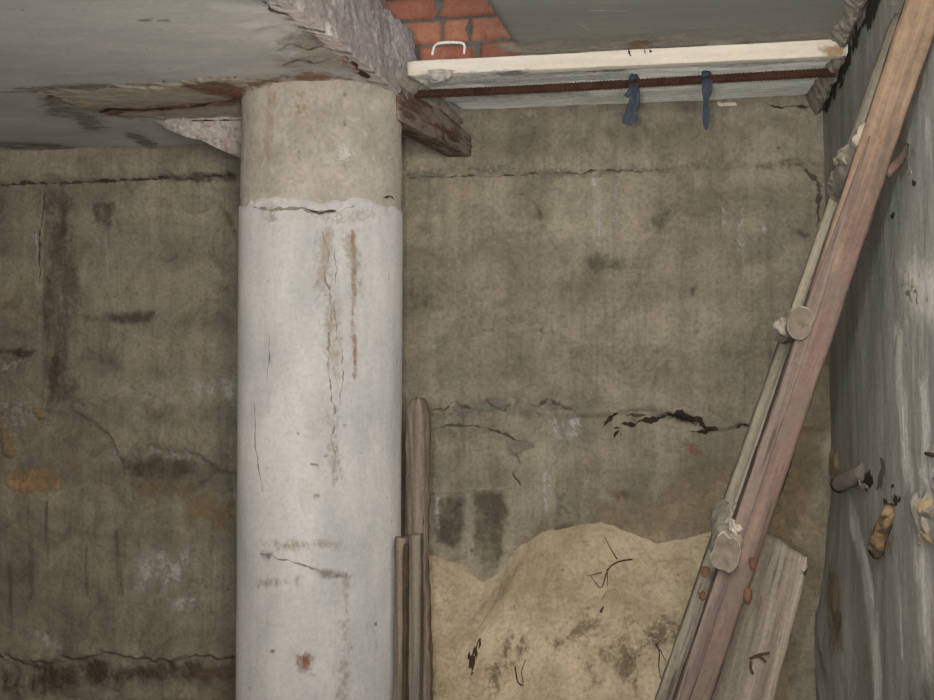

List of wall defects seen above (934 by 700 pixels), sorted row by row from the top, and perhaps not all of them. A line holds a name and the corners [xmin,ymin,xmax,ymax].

corrosion [183,75,265,101]
spalling [263,0,417,99]
crack [0,173,236,280]
crack [254,205,369,468]
crack [254,405,263,489]
crack [602,398,749,438]
damp [435,493,506,558]